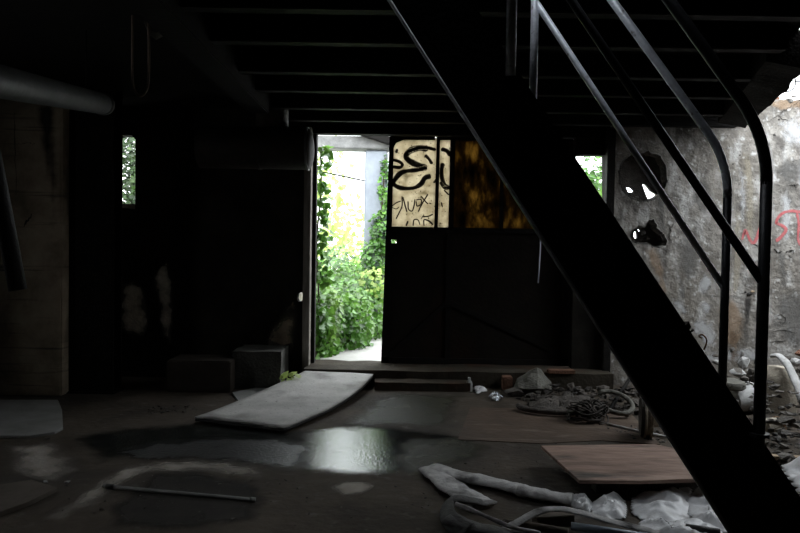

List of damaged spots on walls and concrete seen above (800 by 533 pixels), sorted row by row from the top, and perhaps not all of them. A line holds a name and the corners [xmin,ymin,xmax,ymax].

spalling [618,149,669,203]
spalling [631,218,668,248]